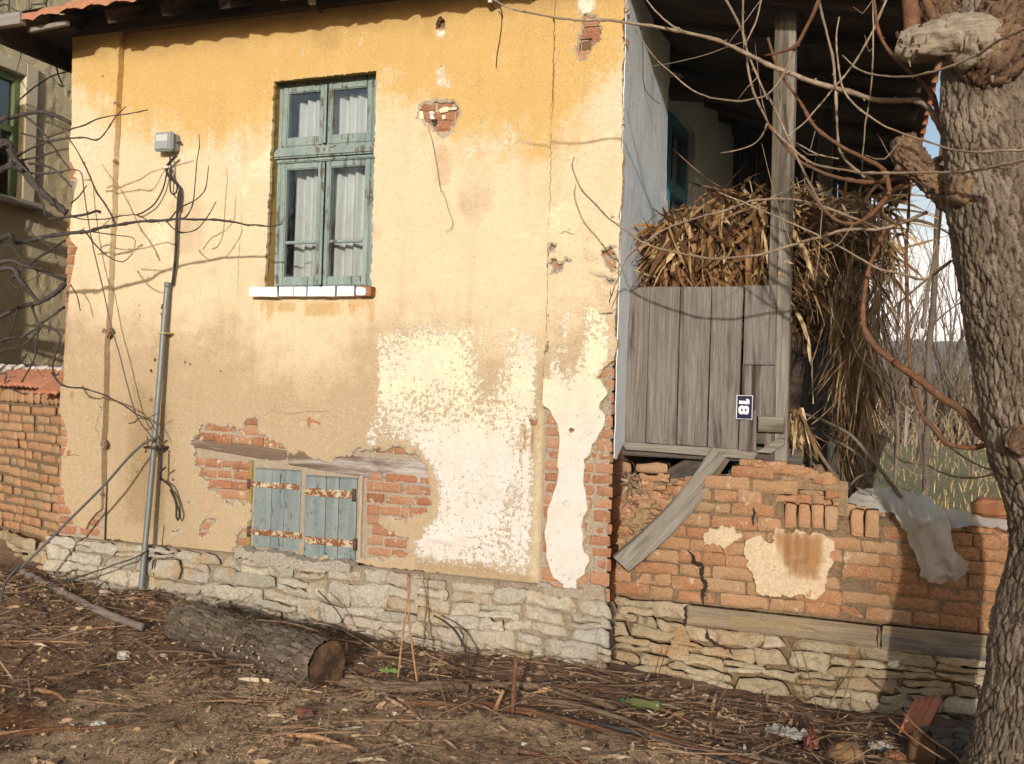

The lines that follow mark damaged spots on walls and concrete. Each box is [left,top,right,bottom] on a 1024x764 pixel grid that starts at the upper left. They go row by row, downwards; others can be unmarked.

flaking render [574,0,603,62]
flaking render [415,66,462,140]
peeling [188,306,623,602]
crack [683,550,733,655]